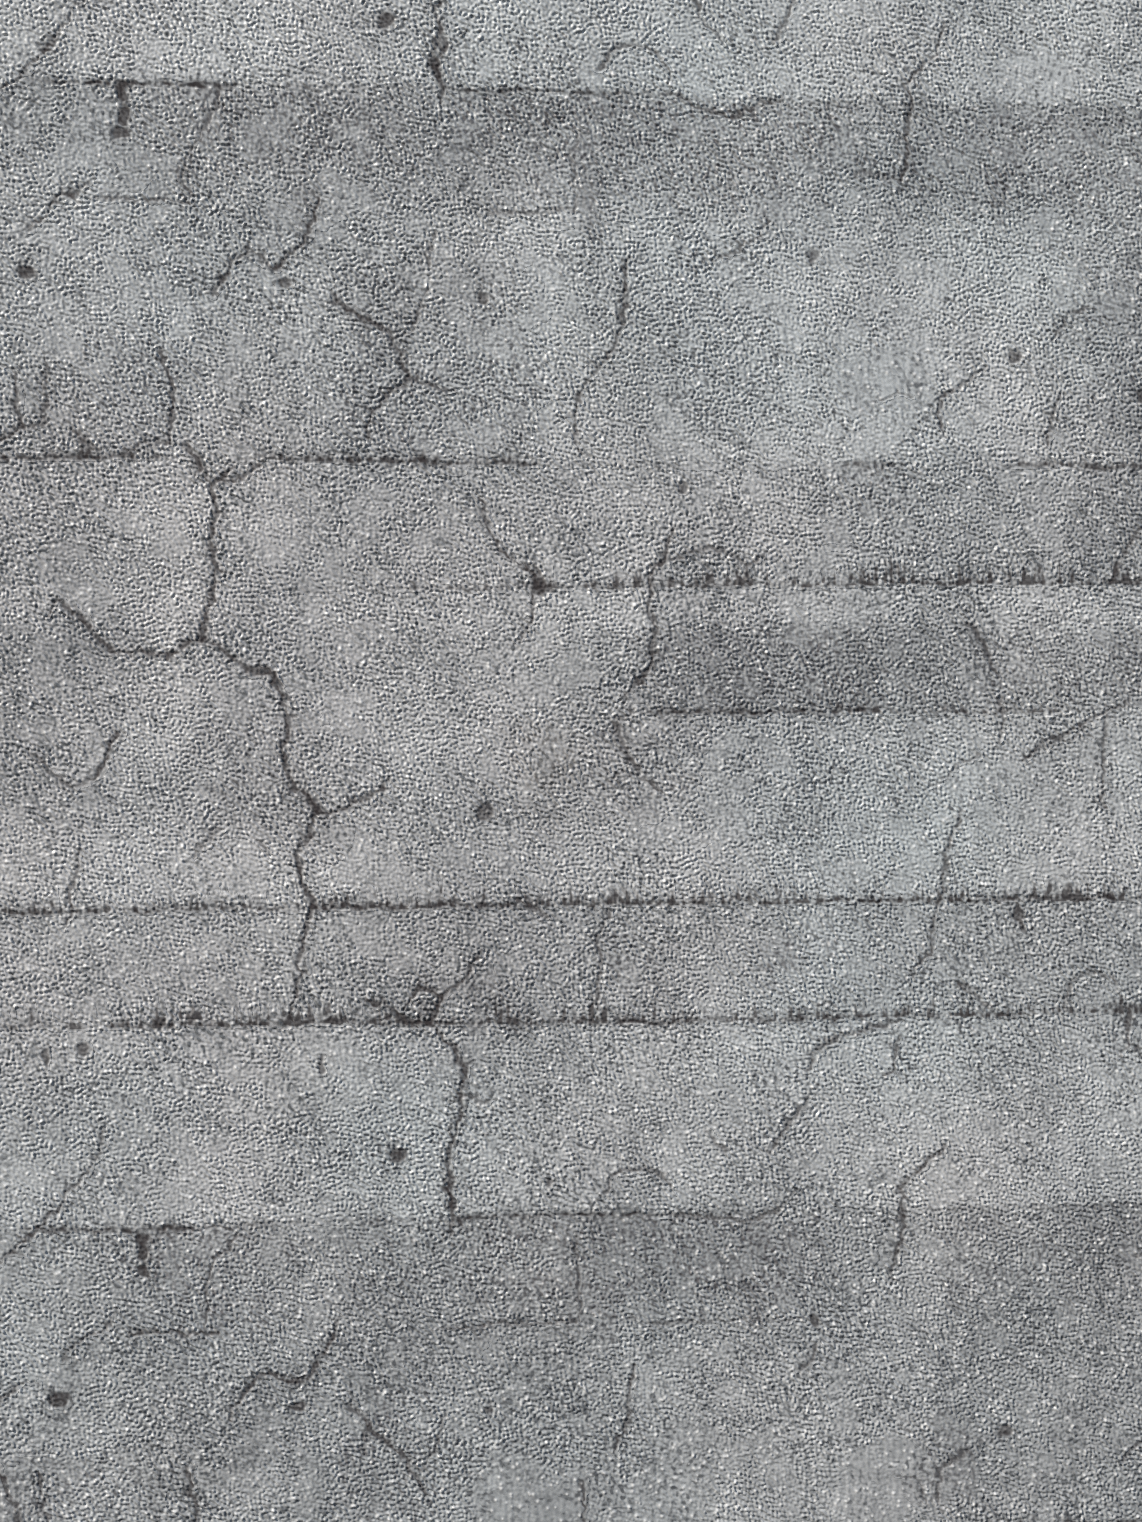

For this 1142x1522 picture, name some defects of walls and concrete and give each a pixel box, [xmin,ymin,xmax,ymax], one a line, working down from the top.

crack [423,0,452,107]
crack [205,189,322,300]
crack [328,229,457,446]
crack [0,345,392,1031]
crack [604,523,768,795]
crack [909,615,1132,1012]
crack [361,947,498,1241]
crack [439,1231,585,1334]
crack [599,1160,801,1226]
crack [702,1017,904,1158]
crack [887,1139,949,1286]
crack [574,1312,823,1522]